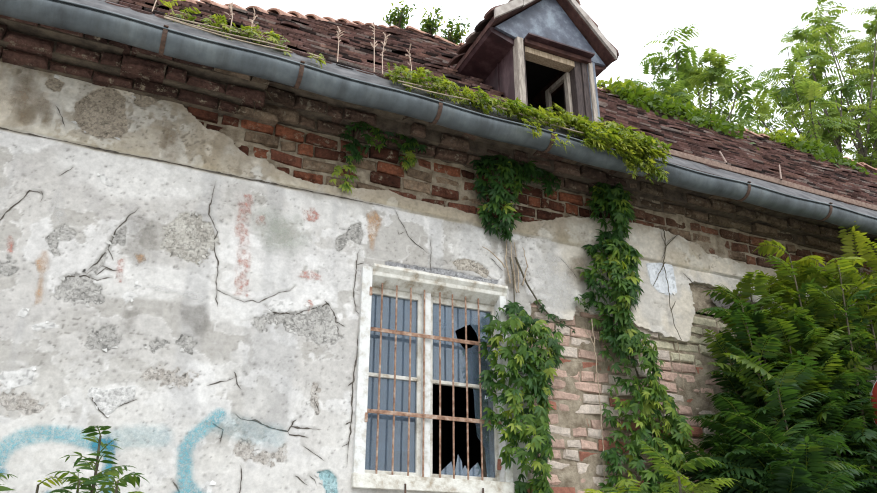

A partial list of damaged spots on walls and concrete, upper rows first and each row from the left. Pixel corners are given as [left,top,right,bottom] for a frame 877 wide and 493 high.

flaking render [71,87,158,140]
spalling [159,212,220,265]
flaking render [335,223,366,251]
spalling [0,255,19,277]
spalling [54,225,127,307]
crack [0,106,431,457]
spalling [251,301,343,344]
crack [213,387,324,486]